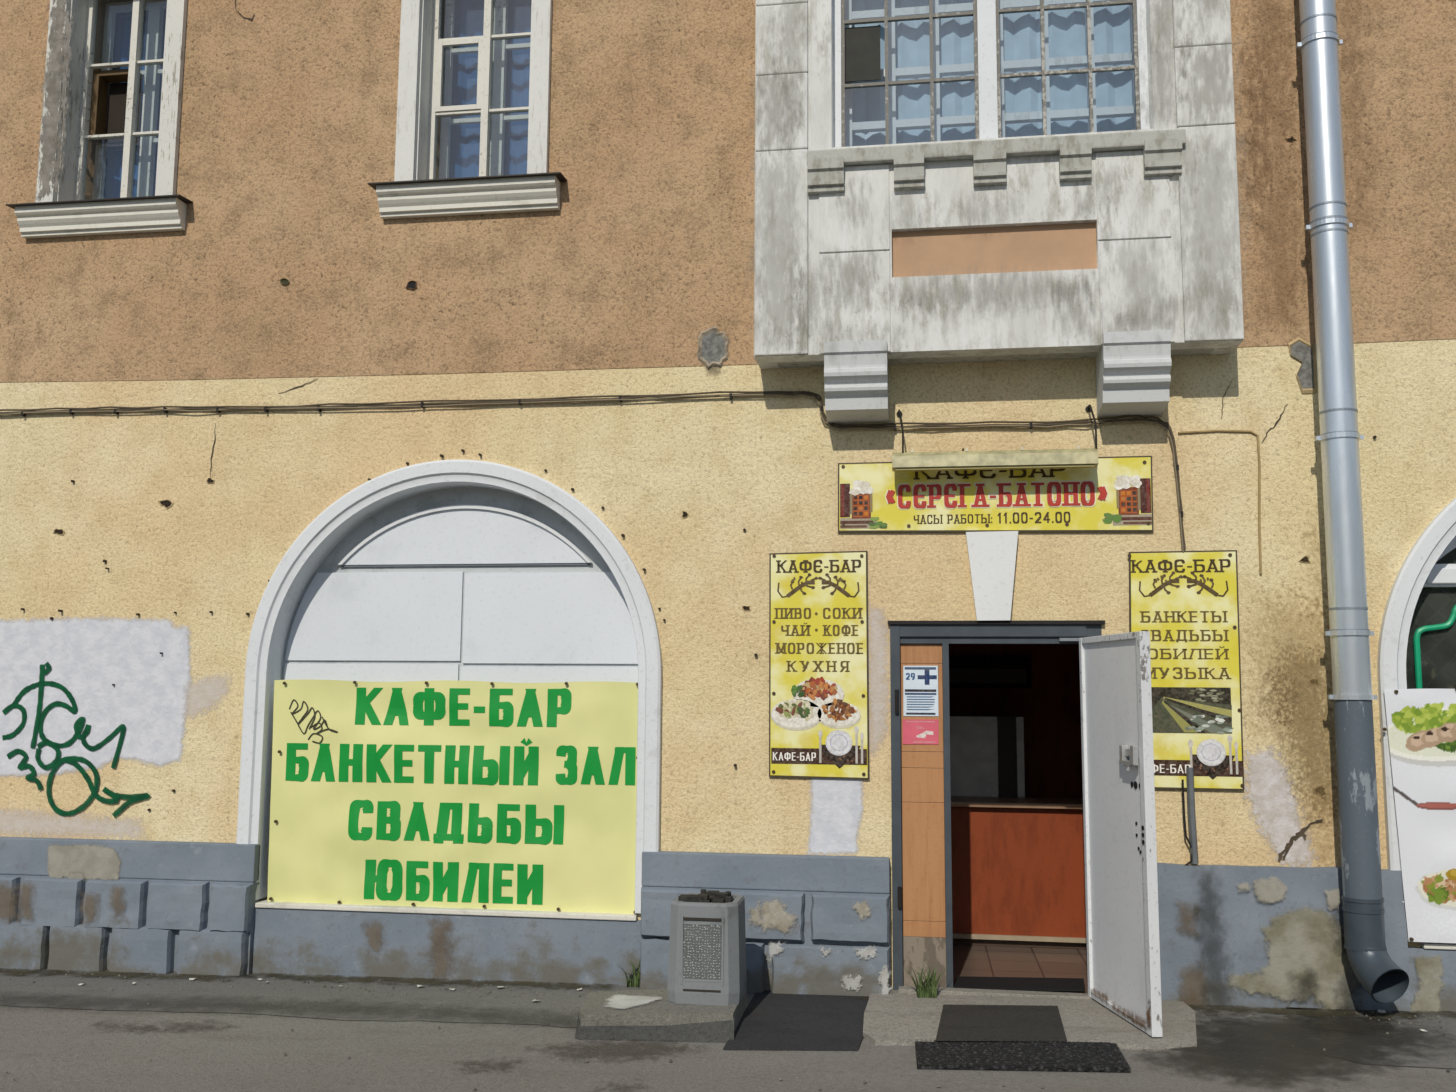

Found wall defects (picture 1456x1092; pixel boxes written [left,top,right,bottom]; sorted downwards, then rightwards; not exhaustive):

peeling [35,0,73,201]
flaking render [1288,337,1317,394]
peeling [1228,746,1360,1010]
peeling [749,900,798,960]
peeling [841,945,892,995]